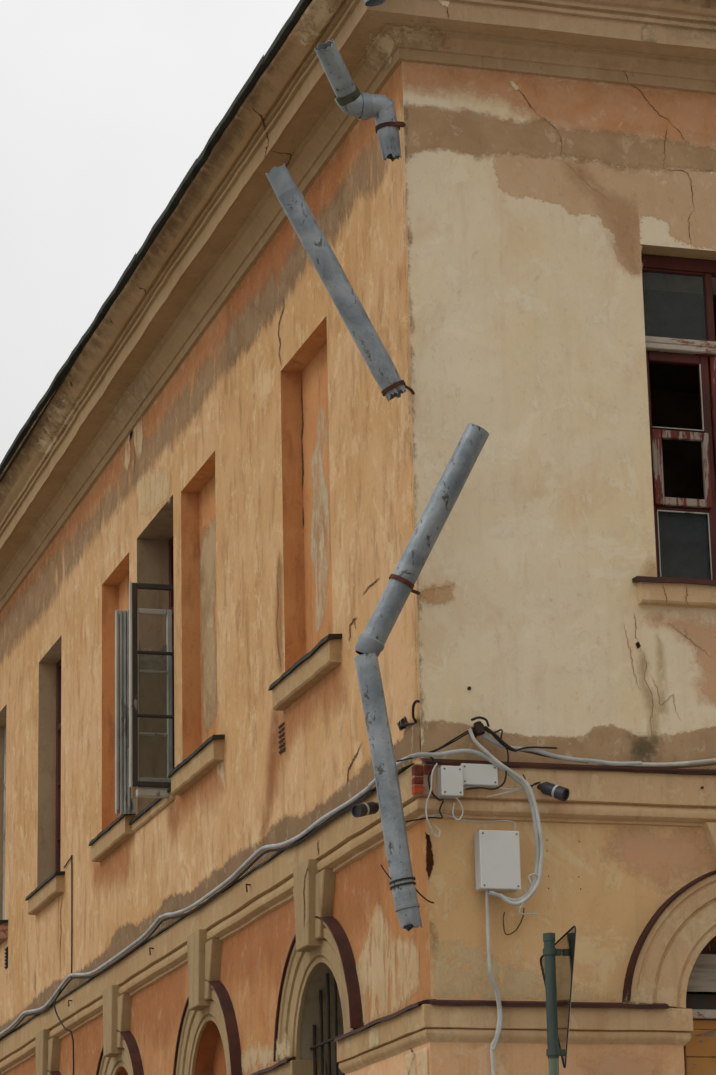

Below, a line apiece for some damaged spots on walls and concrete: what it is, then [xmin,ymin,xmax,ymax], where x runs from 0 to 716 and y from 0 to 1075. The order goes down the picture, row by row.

peeling [353,29,716,274]
crack [624,72,716,248]
peeling [230,219,296,311]
crack [624,614,680,733]
crack [662,584,709,656]
peeling [655,616,716,703]
peeling [394,687,716,796]
peeling [0,760,381,1037]